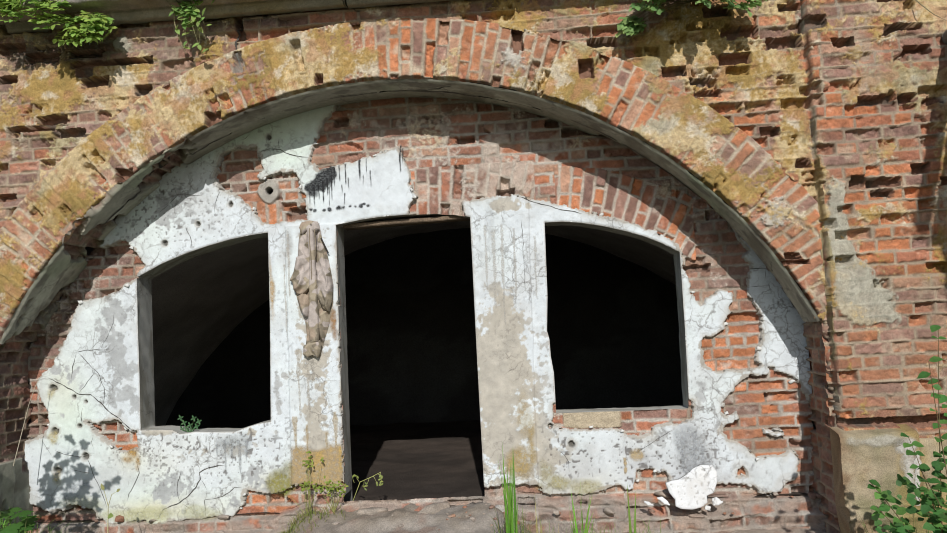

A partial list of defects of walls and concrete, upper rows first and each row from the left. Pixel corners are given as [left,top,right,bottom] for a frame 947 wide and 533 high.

flaking render [0,84,223,450]
flaking render [217,149,307,224]
damp [309,160,371,203]
flaking render [311,97,814,487]
peeling [638,0,947,322]
crack [44,317,130,507]
crack [158,465,239,519]